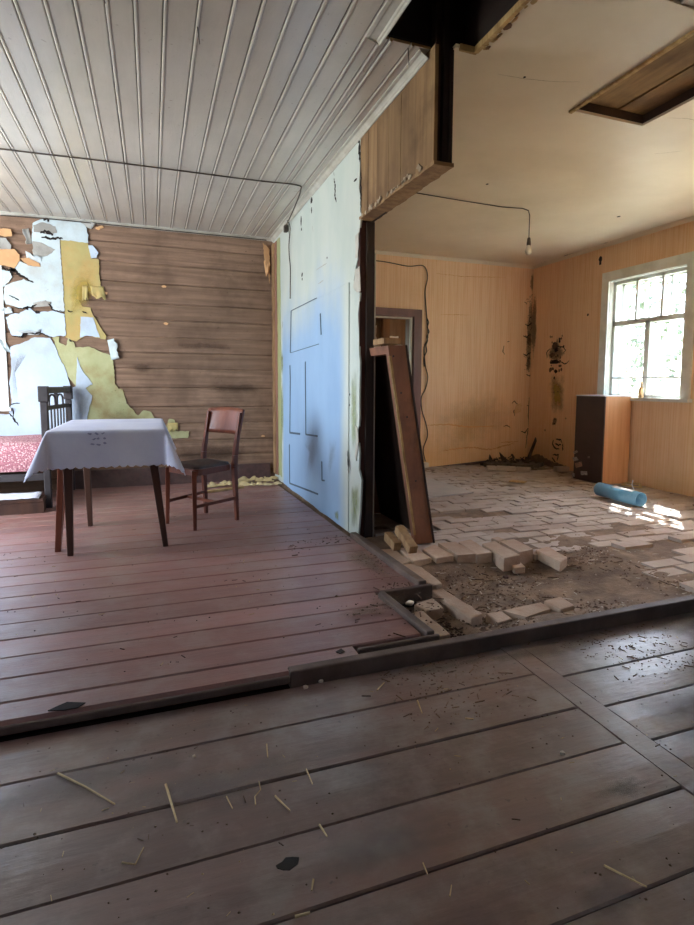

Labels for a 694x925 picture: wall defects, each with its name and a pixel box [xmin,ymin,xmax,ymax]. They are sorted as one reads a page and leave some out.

flaking render [0,218,98,436]
flaking render [80,317,119,360]
damp [523,276,536,377]
damp [546,335,569,405]